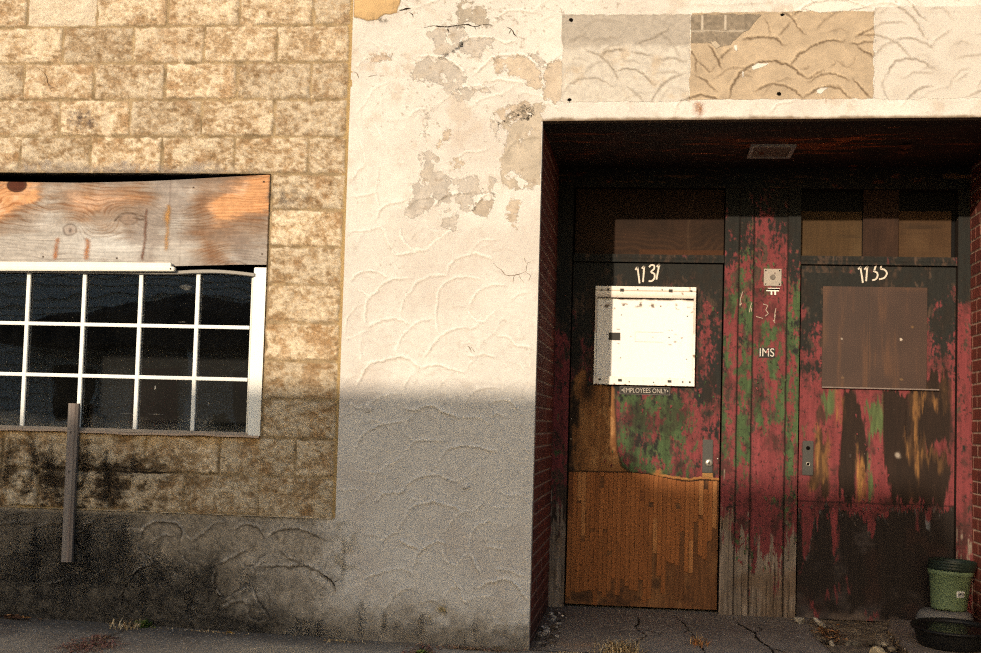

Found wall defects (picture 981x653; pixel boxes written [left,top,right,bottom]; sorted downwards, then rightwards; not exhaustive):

spalling [354,0,400,21]
peeling [404,0,570,231]
water stain [0,442,280,633]
crack [631,614,705,653]
crack [733,618,784,653]